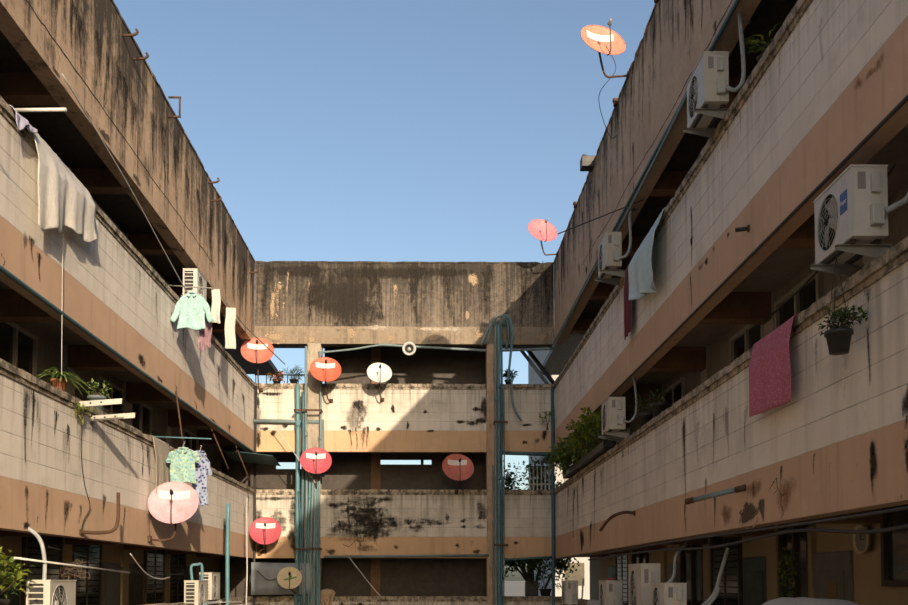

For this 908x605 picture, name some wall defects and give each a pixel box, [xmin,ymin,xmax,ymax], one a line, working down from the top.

leakage [56,0,84,72]
leakage [95,30,136,123]
leakage [145,114,179,184]
leakage [187,176,213,266]
leakage [224,234,246,316]
leakage [262,263,472,326]
leakage [341,400,380,446]
leakage [457,391,487,425]
leakage [869,443,877,491]
leakage [328,497,449,551]